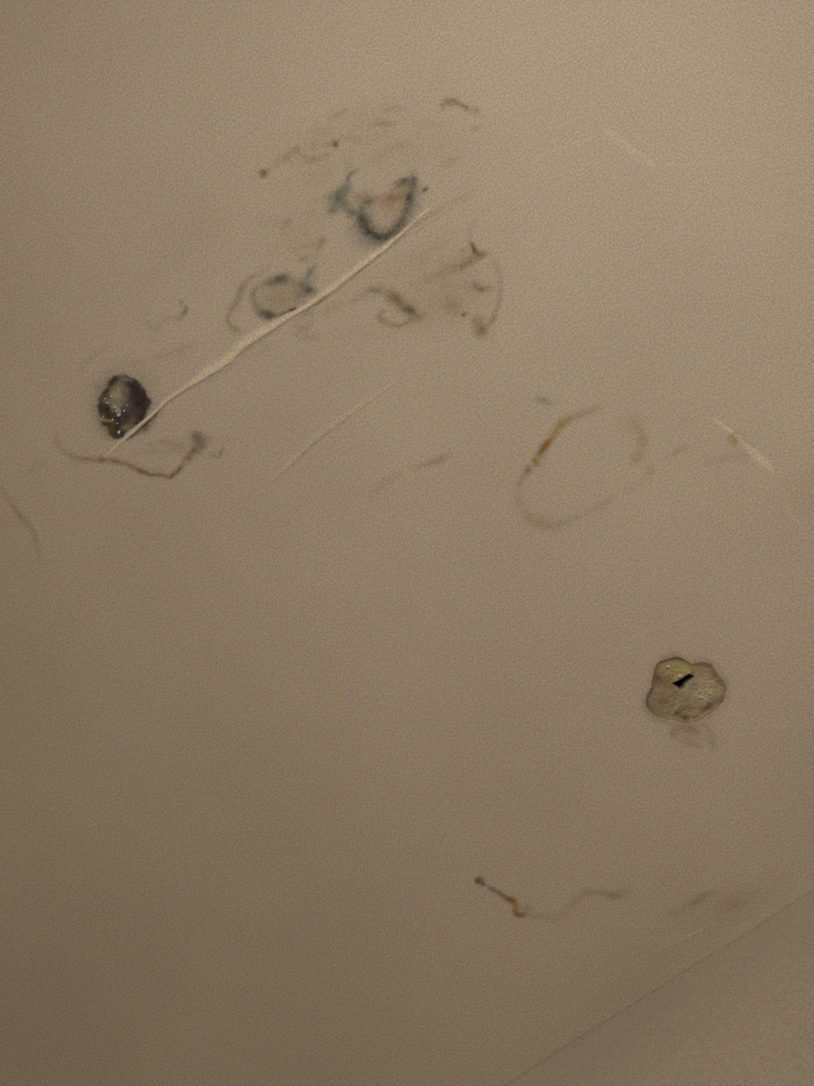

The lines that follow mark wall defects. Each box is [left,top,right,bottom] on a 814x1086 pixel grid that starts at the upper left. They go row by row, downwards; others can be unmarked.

flaking render [645,657,727,723]